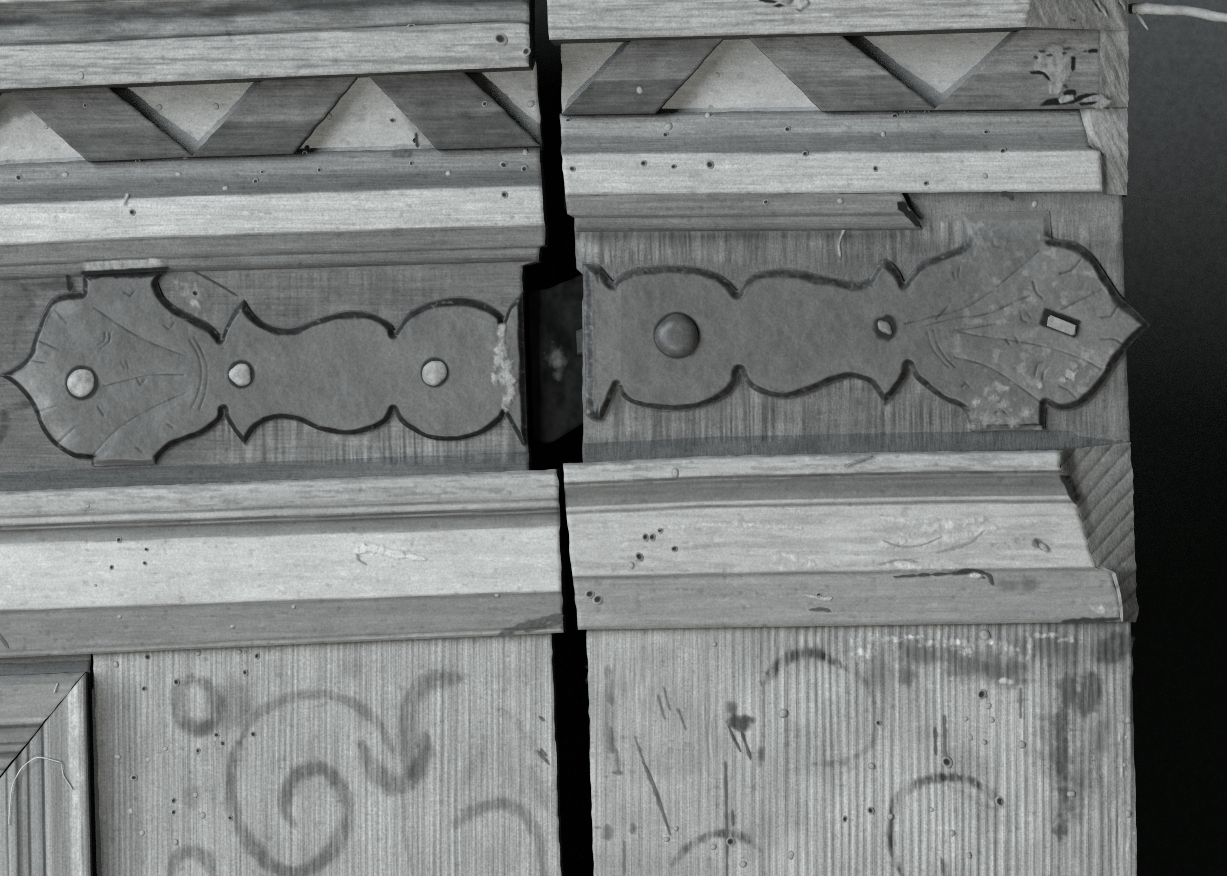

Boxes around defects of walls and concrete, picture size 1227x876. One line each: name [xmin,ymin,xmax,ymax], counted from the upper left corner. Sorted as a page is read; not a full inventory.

damp [900,647,930,684]
damp [954,656,1025,718]
damp [1056,633,1130,774]
damp [933,715,947,757]